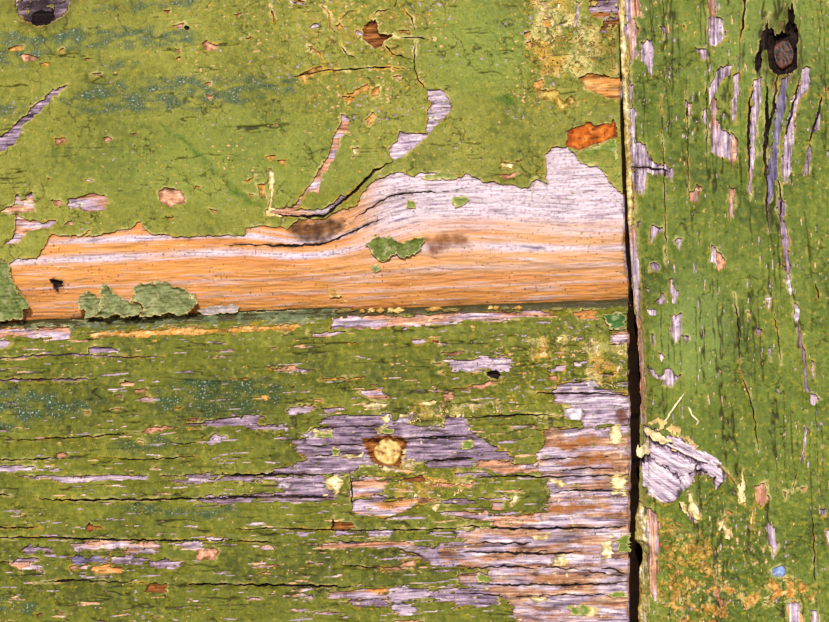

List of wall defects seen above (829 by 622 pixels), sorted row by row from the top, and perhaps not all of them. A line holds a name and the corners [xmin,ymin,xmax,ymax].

peeling [0,85,67,151]
peeling [301,46,323,82]
peeling [342,84,380,104]
peeling [389,89,452,161]
crack [632,117,668,256]
peeling [689,184,702,203]
crack [686,88,708,199]
crack [747,77,800,231]
crack [809,97,822,142]
crack [733,304,741,357]
peeling [0,114,699,622]
crack [742,378,759,448]